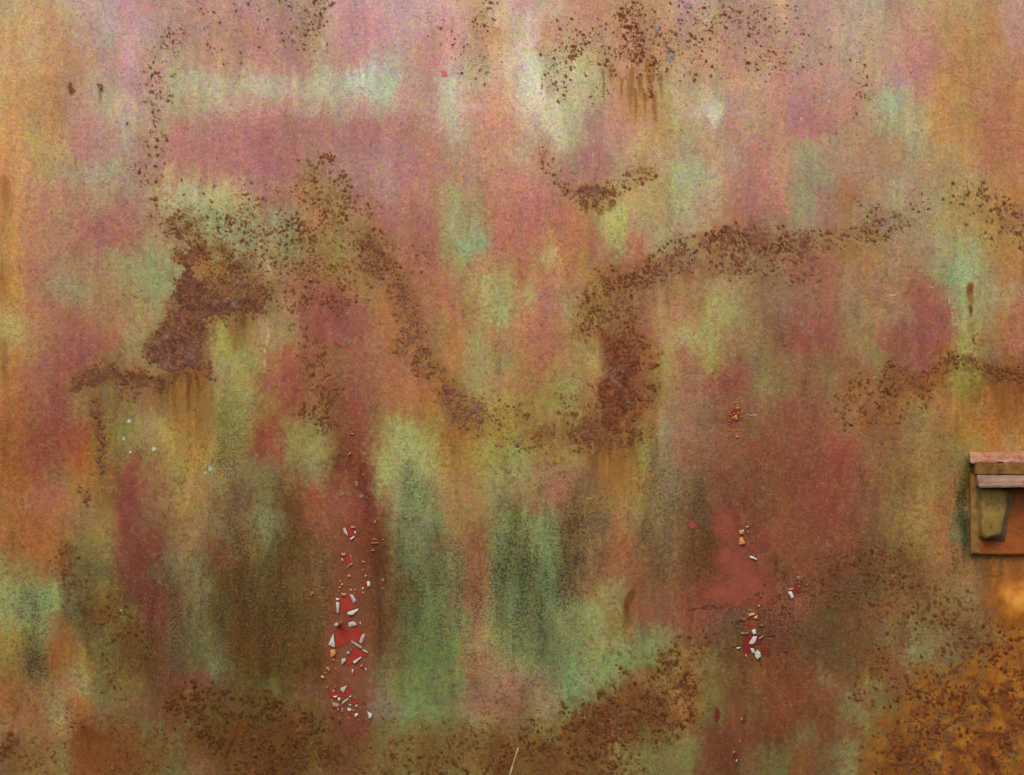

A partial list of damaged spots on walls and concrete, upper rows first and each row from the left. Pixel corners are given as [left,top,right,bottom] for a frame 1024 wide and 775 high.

rust [68,0,930,474]
rust [827,349,1024,435]
peeling [321,526,384,723]
rust [0,543,822,775]
peeling [696,505,808,659]
rust [791,540,1024,775]